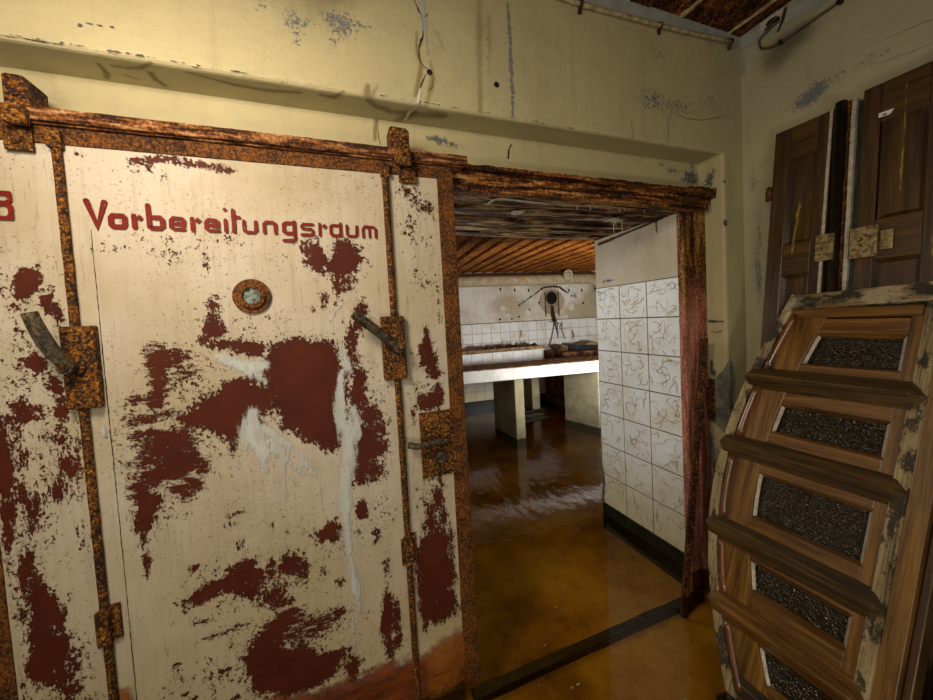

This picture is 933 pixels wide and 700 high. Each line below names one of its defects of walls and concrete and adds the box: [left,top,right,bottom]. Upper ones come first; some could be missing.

peeling [277,8,372,53]
peeling [781,61,849,117]
peeling [125,153,237,180]
peeling [390,180,442,323]
peeling [407,326,446,426]
peeling [0,263,104,700]
peeling [106,230,406,700]
peeling [410,453,462,635]
corrosion [268,632,465,700]